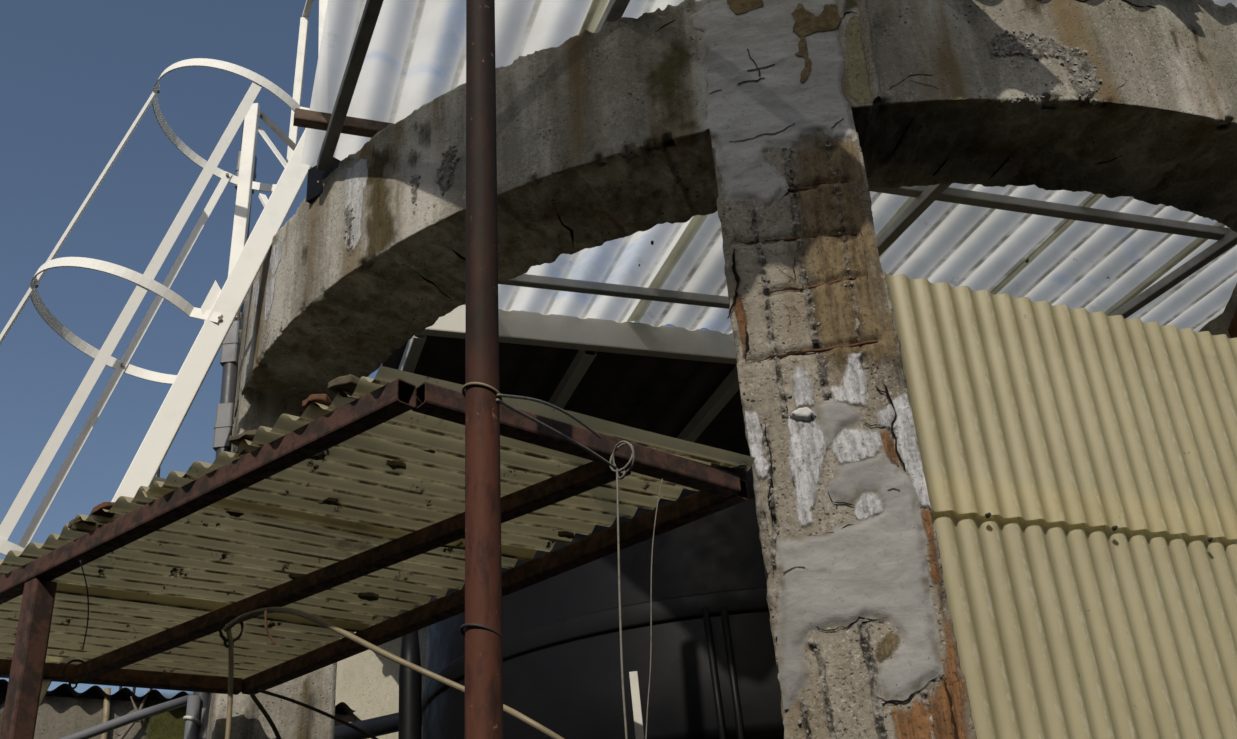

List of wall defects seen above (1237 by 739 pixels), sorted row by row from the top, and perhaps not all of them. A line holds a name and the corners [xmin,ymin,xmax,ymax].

spalling [991,28,1102,105]
peeling [745,353,930,525]
crack [865,382,905,491]
crack [817,616,886,631]
rust [891,619,968,739]